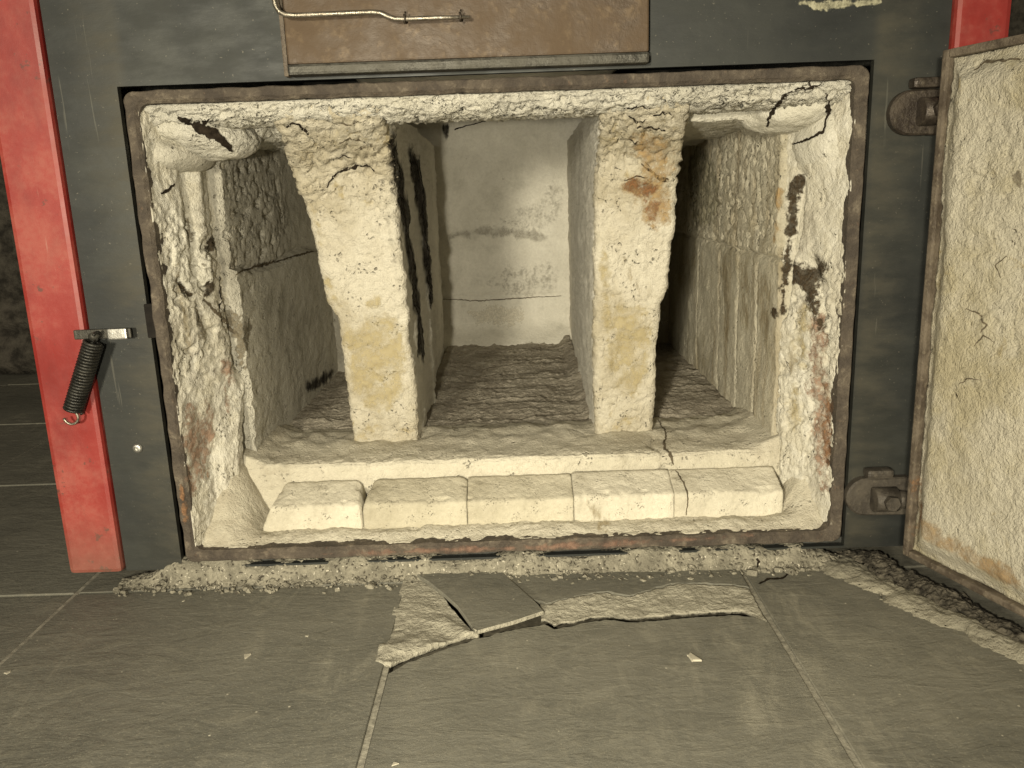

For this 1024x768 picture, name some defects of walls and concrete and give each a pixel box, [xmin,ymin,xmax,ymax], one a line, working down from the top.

crack [177,116,233,152]
crack [326,121,375,188]
rust [623,132,675,227]
crack [766,81,832,145]
damp [388,134,433,361]
crack [657,418,689,515]
spalling [375,578,479,668]
spalling [540,584,767,627]